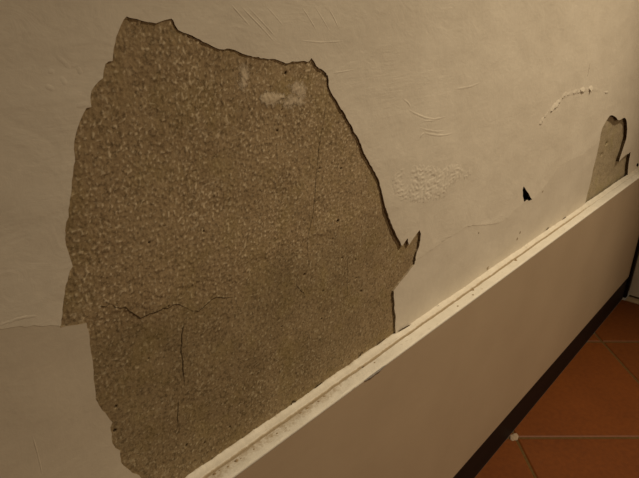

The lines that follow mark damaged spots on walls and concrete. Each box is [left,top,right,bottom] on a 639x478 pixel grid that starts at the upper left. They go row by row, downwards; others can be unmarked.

crack [101,297,229,319]
spalling [0,16,421,478]
peeling [394,115,630,333]